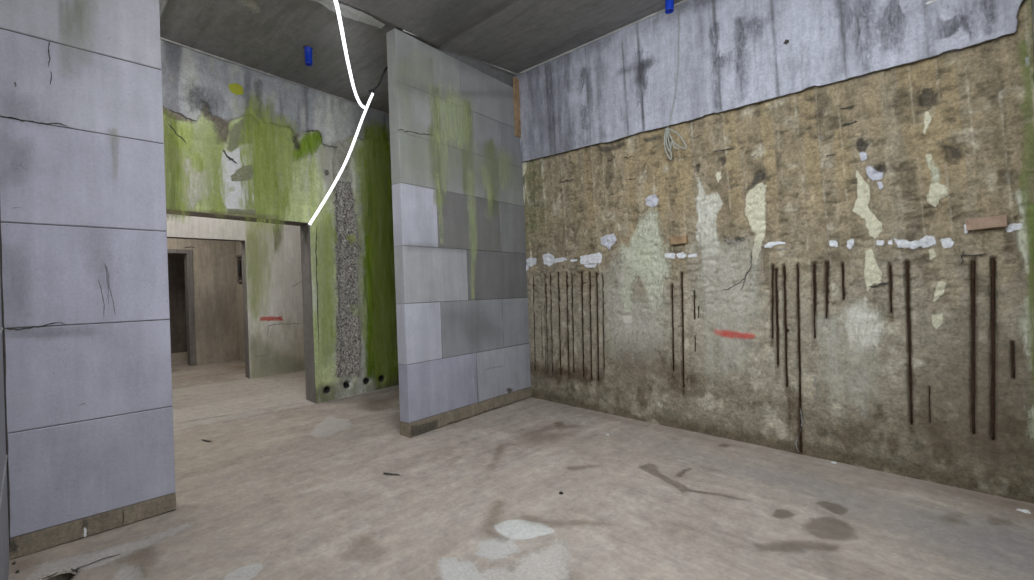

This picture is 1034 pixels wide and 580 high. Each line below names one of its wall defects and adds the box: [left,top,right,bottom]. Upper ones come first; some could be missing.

crack [0,210,65,546]
crack [0,115,73,128]
crack [98,264,116,315]
leakage [163,78,323,378]
spalling [317,136,363,379]
leakage [354,40,521,411]
peeling [526,155,845,454]
leakage [708,10,774,110]
peeling [828,137,954,436]
peeling [925,140,969,207]
leakage [933,0,1000,59]
spalling [966,189,1034,452]